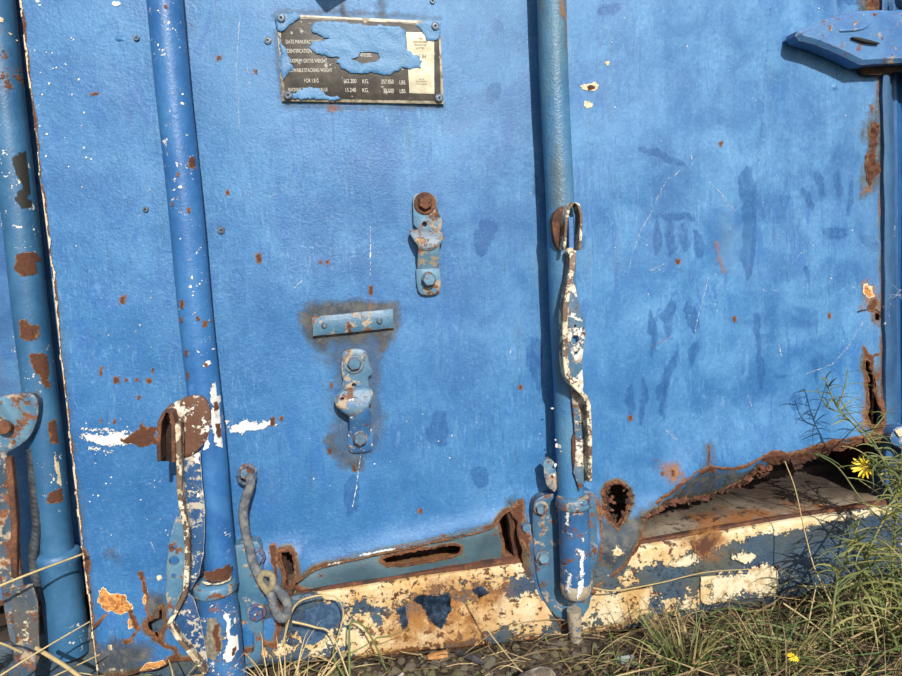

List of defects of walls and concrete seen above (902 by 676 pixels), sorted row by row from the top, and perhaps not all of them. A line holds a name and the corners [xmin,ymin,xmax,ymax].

peeling [310,21,422,76]
peeling [292,87,341,101]
rust [861,104,881,197]
rust [14,0,133,675]
rust [862,346,882,369]
rust [120,422,157,447]
rust [640,412,886,522]
rust [594,481,635,562]
peeling [565,549,585,599]
peeling [665,552,703,568]
peeling [731,549,758,564]
peeling [297,600,344,646]